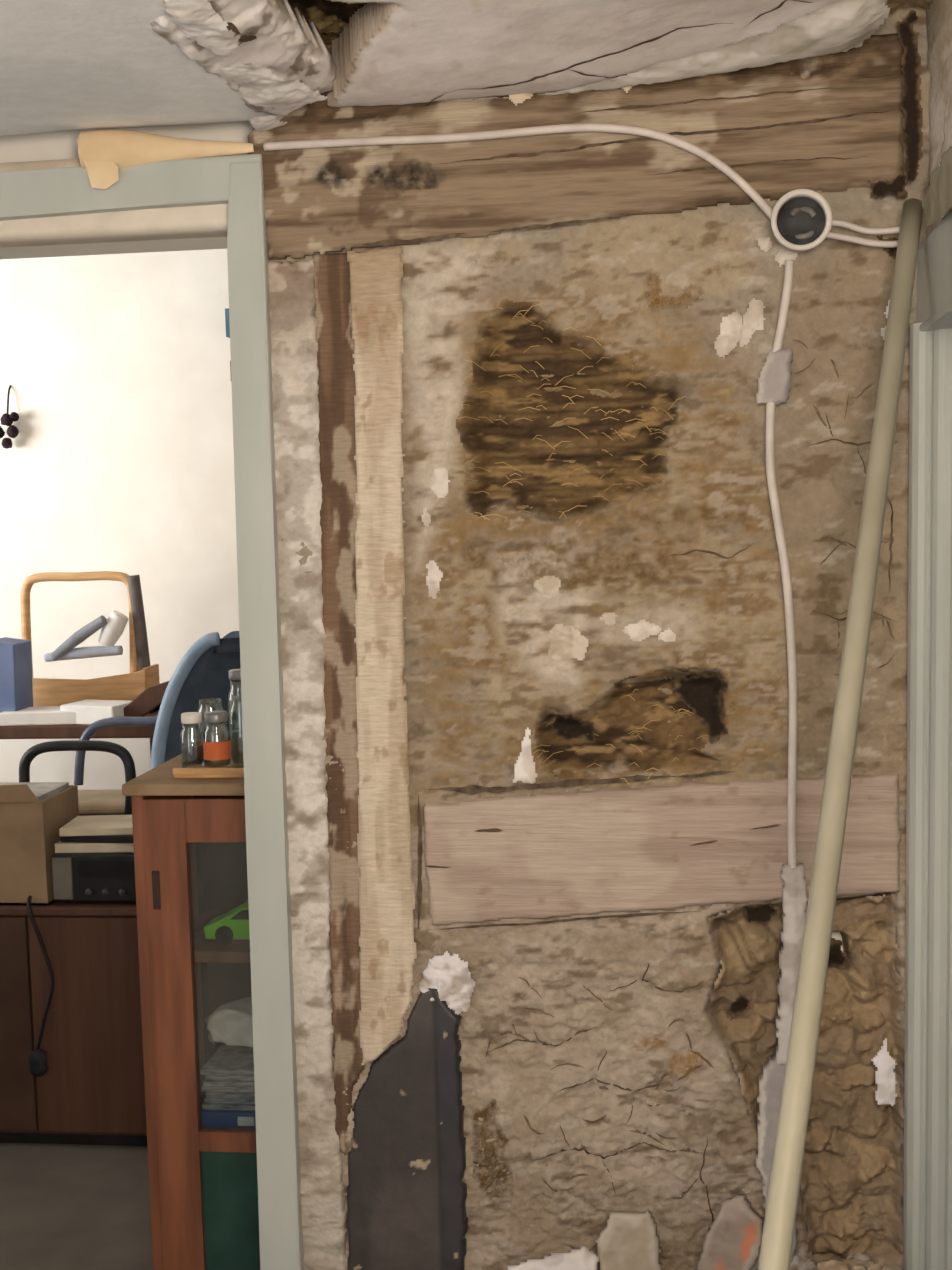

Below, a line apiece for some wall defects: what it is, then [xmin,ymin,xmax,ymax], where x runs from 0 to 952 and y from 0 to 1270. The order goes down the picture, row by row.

peeling [164,0,328,132]
spalling [288,0,367,45]
crack [362,213,640,246]
crack [412,0,899,165]
crack [639,156,867,176]
spalling [867,0,952,227]
spalling [427,299,686,523]
spalling [513,666,737,785]
peeling [419,951,476,1015]
crack [475,964,714,1231]
spalling [706,901,783,1120]
spalling [800,894,905,1266]